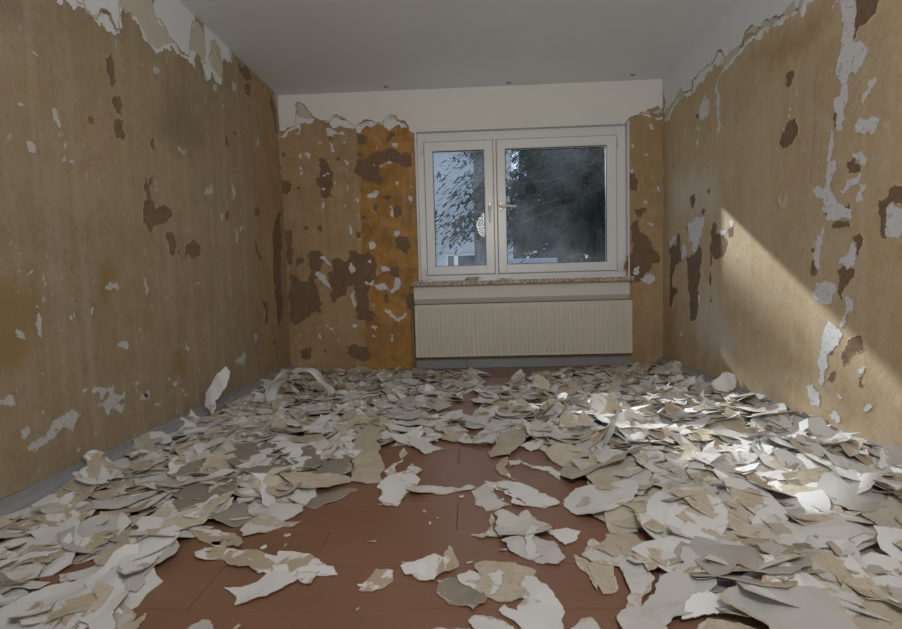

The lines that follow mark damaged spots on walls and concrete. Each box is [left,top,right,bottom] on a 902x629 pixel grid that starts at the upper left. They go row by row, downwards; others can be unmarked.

flaking render [786,70,795,90]
flaking render [141,176,201,260]
flaking render [269,92,301,195]
flaking render [253,128,416,362]
flaking render [629,169,639,192]
flaking render [624,194,734,322]
peeling [806,0,881,407]
flaking render [877,184,902,240]